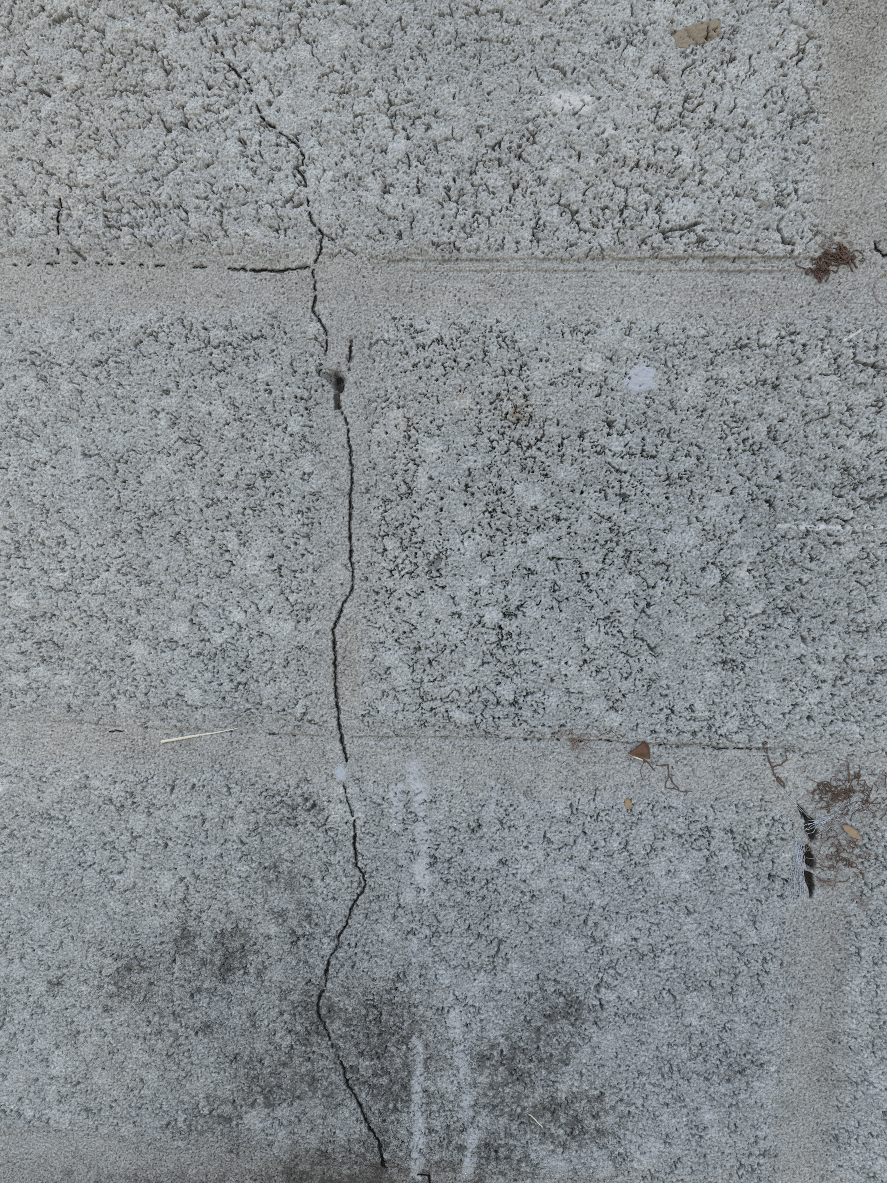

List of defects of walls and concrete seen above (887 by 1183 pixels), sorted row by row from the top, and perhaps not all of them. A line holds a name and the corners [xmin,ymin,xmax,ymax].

crack [192,35,352,376]
crack [316,403,388,1168]